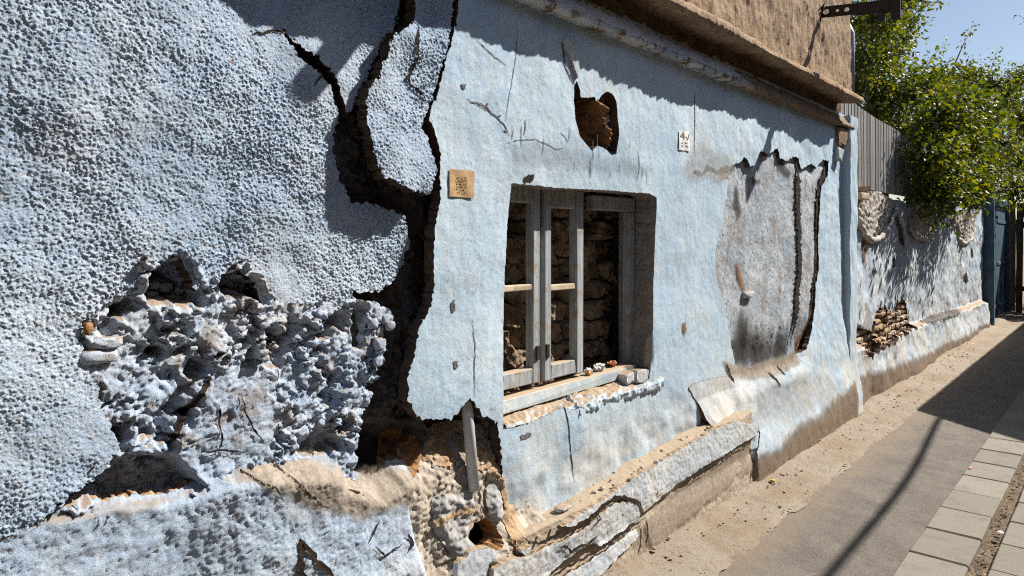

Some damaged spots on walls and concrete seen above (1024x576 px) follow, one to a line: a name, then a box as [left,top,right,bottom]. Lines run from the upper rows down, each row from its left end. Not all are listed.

crack [394,0,426,100]
spalling [575,95,613,151]
crack [252,29,433,472]
flaking render [692,147,844,368]
flaking render [856,299,911,356]
spalling [54,240,759,576]
crack [521,495,649,576]